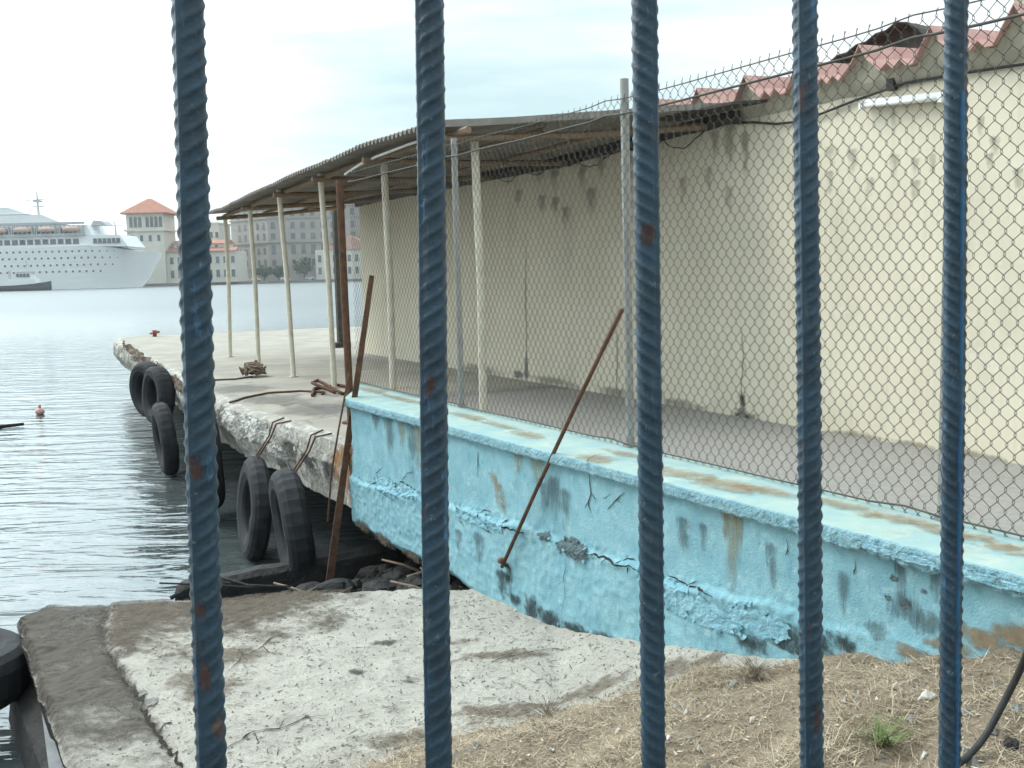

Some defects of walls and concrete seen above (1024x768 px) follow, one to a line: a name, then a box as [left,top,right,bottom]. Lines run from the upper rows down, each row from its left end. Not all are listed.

spalling [216,405,296,466]
flaking render [370,476,421,499]
crack [585,453,622,512]
water stain [496,566,611,638]
spalling [537,531,589,564]
crack [590,553,639,574]
crack [669,576,712,597]
flaking render [664,575,791,644]